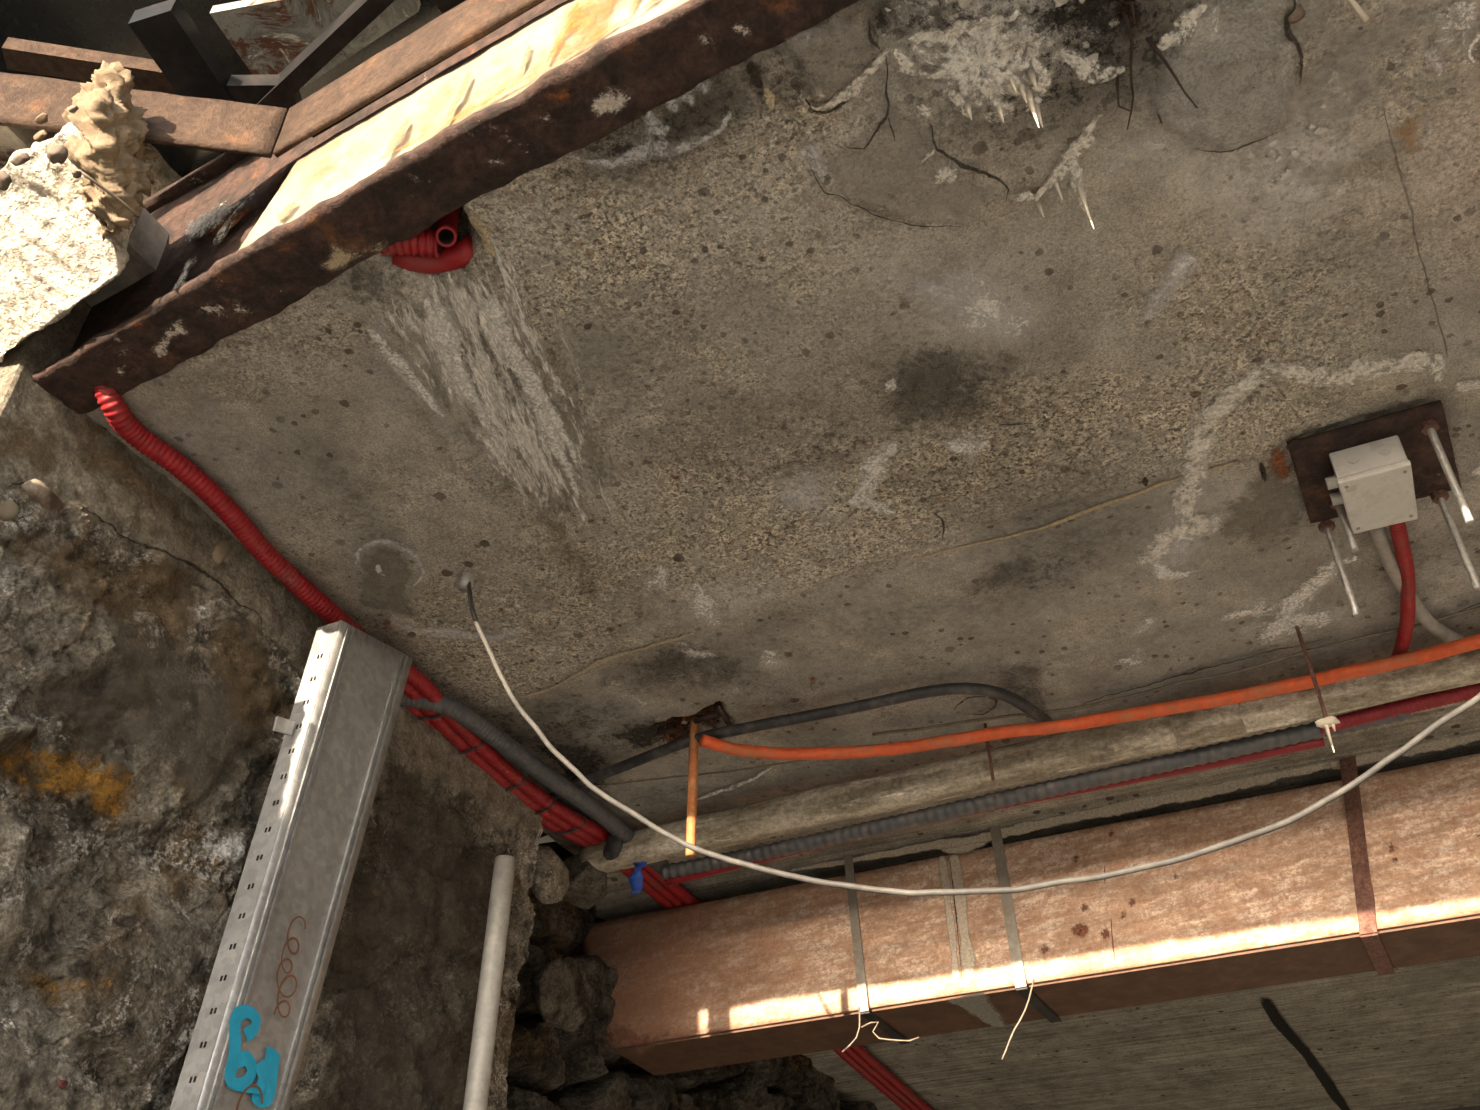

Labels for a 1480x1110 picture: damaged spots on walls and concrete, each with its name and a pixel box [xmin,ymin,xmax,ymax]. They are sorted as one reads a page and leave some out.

corrosion [547,0,657,62]
corrosion [764,87,775,109]
crack [844,17,895,150]
damp [883,4,1055,128]
spalling [885,0,1169,84]
spalling [1198,129,1300,186]
corrosion [207,206,252,235]
corrosion [464,210,495,256]
damp [352,209,613,593]
crack [1261,1000,1350,1110]